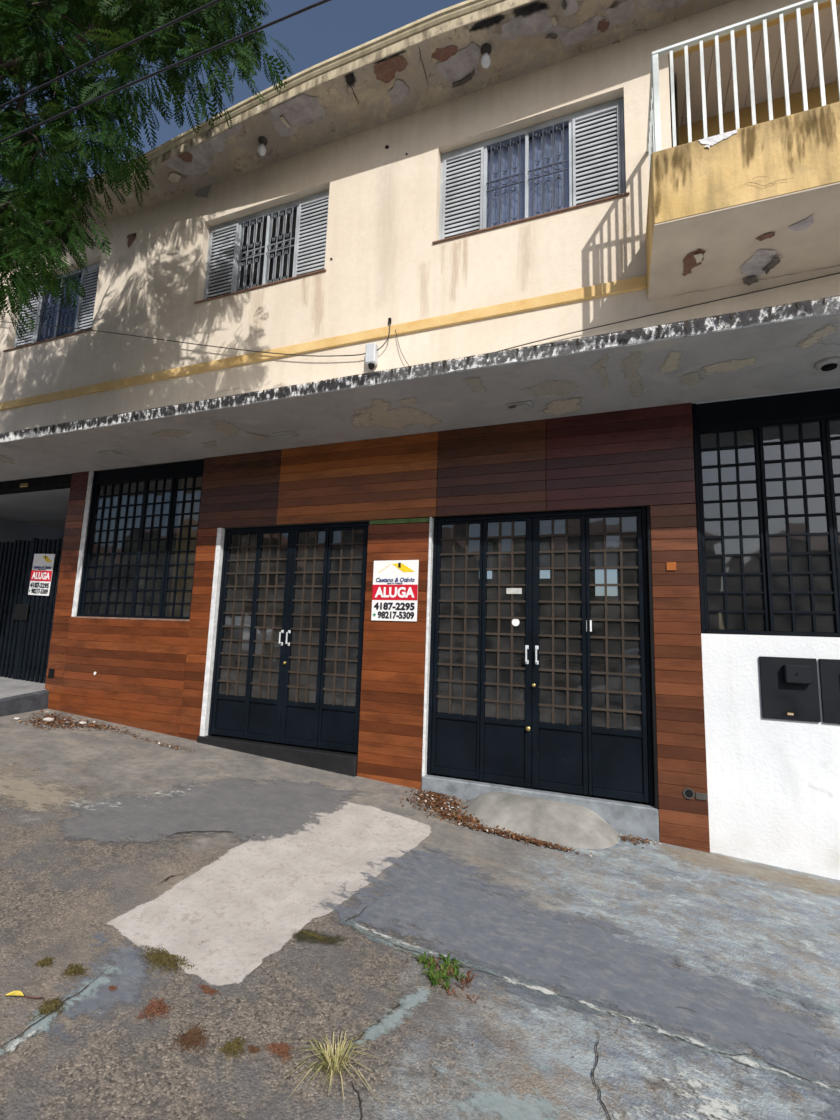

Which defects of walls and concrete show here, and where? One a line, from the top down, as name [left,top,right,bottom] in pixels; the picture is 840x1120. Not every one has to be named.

peeling [501,0,647,47]
flaking render [373,56,409,105]
flaking render [431,43,480,88]
peeling [270,94,326,137]
water stain [742,126,756,162]
water stain [786,107,832,164]
water stain [655,146,691,213]
peeling [682,249,706,276]
peeling [741,232,780,286]
water stain [0,295,840,439]
crack [340,906,840,1120]